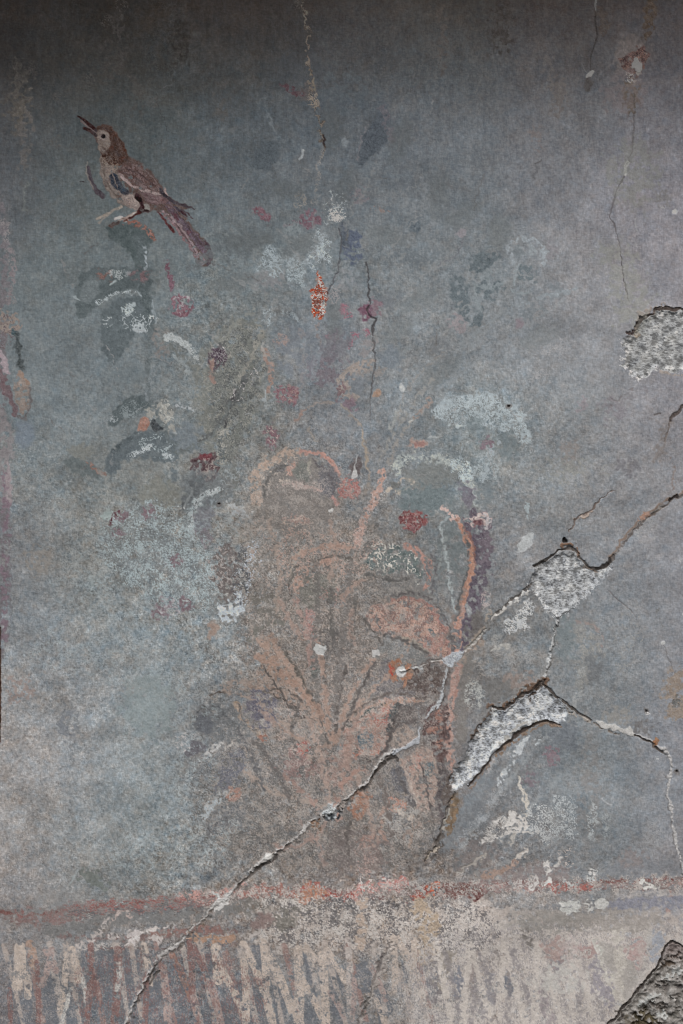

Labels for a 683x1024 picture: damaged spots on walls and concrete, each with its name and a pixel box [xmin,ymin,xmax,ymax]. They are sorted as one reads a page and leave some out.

crack [324,226,380,422]
flaking render [621,305,683,382]
crack [607,493,683,561]
flaking render [503,542,614,637]
crack [391,582,536,756]
flaking render [448,681,574,791]
crack [542,615,683,875]
crack [322,803,338,819]
crack [423,790,463,865]
crack [124,891,233,1024]
crack [356,941,396,1024]
flaking render [607,940,683,1024]